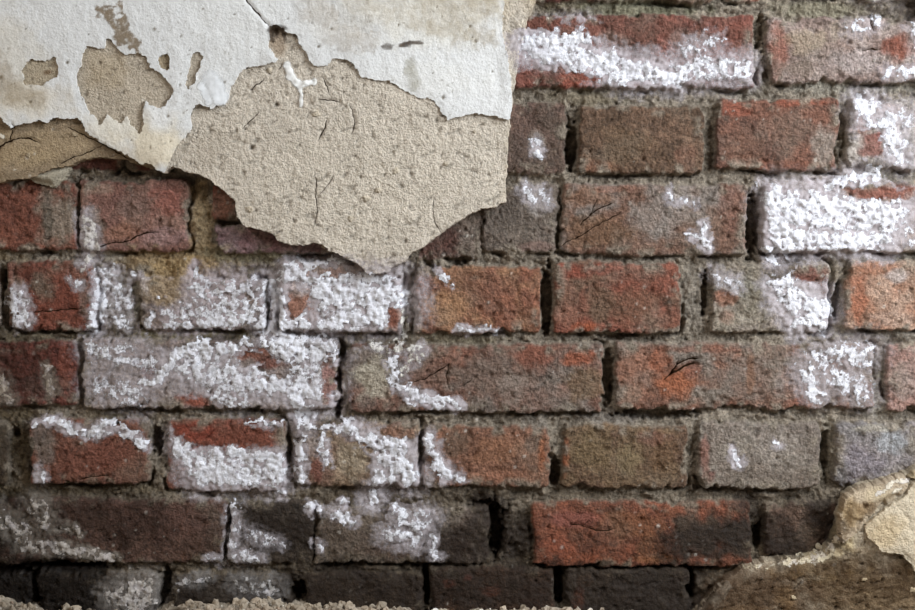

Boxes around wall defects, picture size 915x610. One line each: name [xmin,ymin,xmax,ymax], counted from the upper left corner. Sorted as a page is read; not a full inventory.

flaking render [0,25,511,274]
flaking render [502,0,536,107]
damp [0,208,915,610]
flaking render [704,464,915,610]